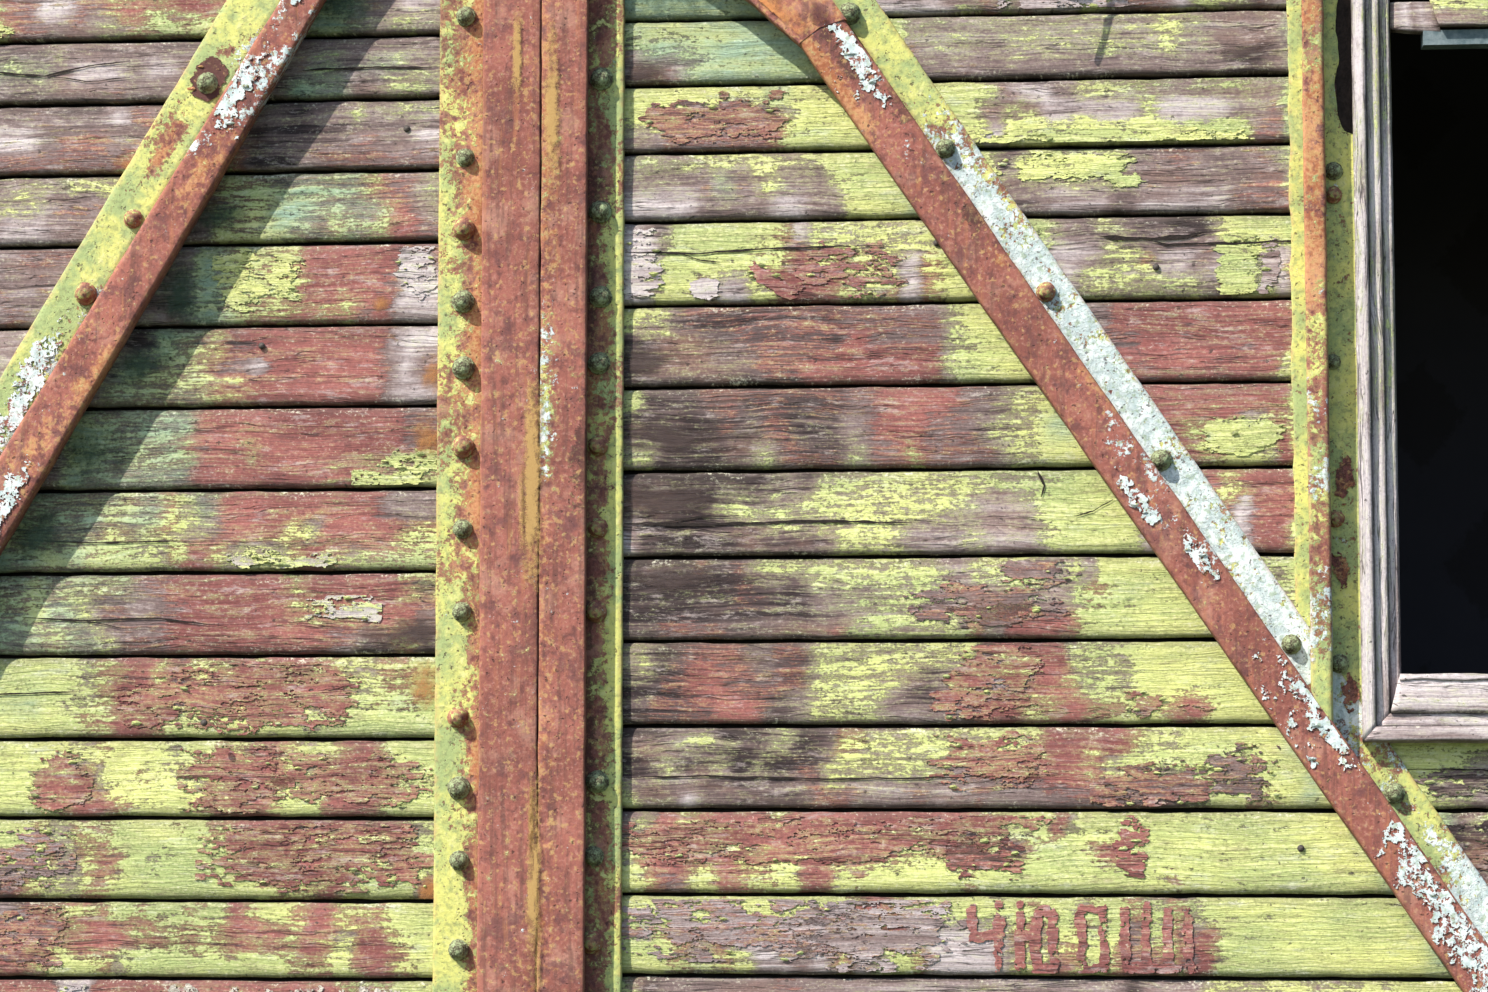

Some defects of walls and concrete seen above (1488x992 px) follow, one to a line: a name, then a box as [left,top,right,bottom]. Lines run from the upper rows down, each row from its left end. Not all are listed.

corrosion [544,23,559,173]
peeling [966,124,1255,187]
peeling [1213,231,1281,295]
corrosion [518,382,542,580]
corrosion [1334,452,1355,505]
corrosion [1331,552,1350,591]
peeling [115,662,434,893]
peeling [1090,652,1366,878]
corrosion [1341,672,1360,713]
corrosion [525,773,541,989]
peeling [621,899,968,973]
peeling [1374,813,1488,992]